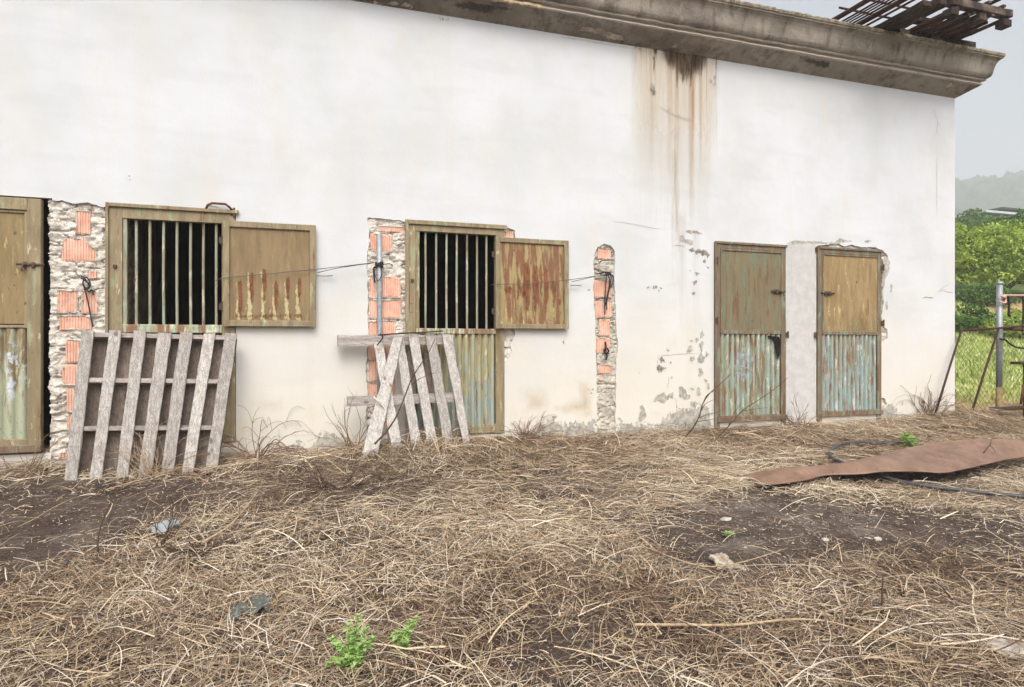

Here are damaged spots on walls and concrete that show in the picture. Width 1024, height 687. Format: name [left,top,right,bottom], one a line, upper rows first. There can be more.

water stain [638,47,717,110]
spalling [47,199,105,463]
rust [235,269,302,319]
spalling [365,218,405,431]
rust [505,259,561,314]
spalling [520,244,712,441]
peeling [680,230,710,295]